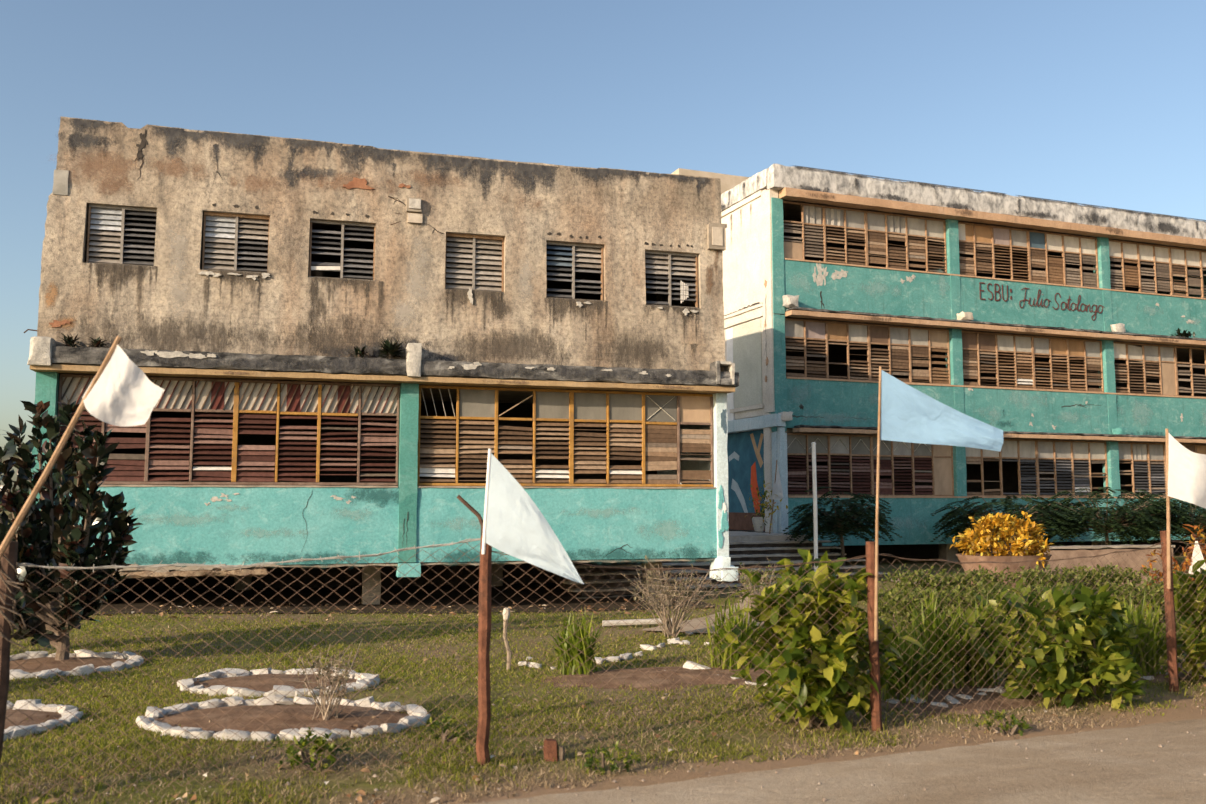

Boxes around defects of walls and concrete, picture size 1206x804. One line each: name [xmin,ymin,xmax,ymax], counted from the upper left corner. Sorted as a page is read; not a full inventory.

water stain [59,118,115,157]
water stain [152,126,270,164]
water stain [284,139,557,197]
water stain [572,168,710,199]
water stain [793,165,1206,235]
peeling [792,263,848,286]
water stain [81,262,418,371]
water stain [428,289,716,382]